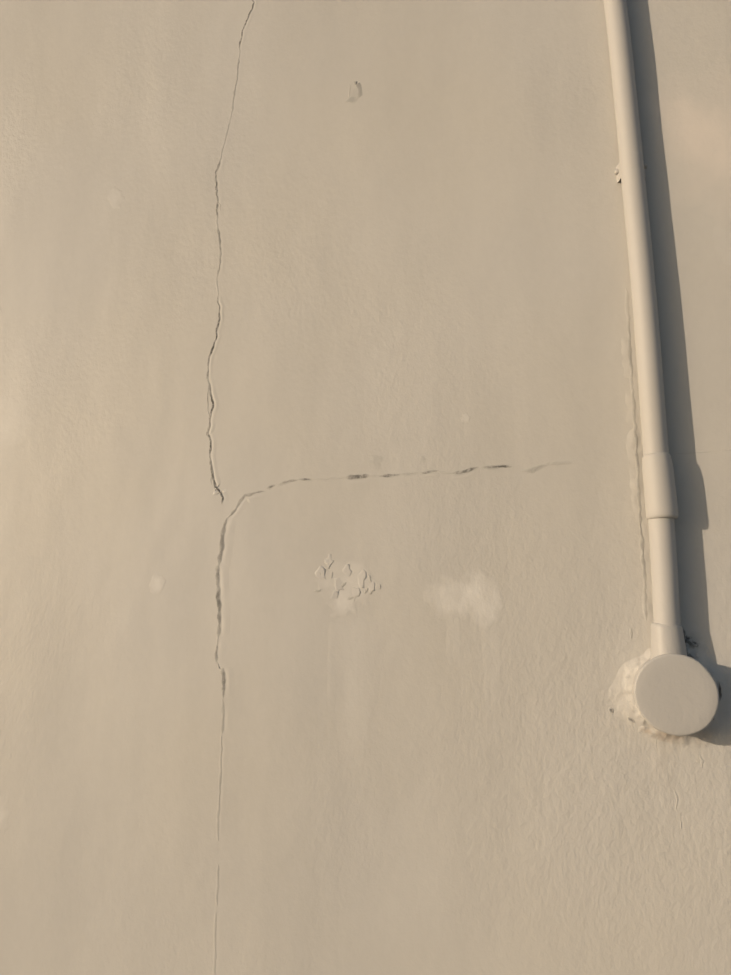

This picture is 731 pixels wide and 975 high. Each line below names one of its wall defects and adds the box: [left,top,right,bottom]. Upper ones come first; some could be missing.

crack [206,0,572,841]
crack [212,864,227,975]